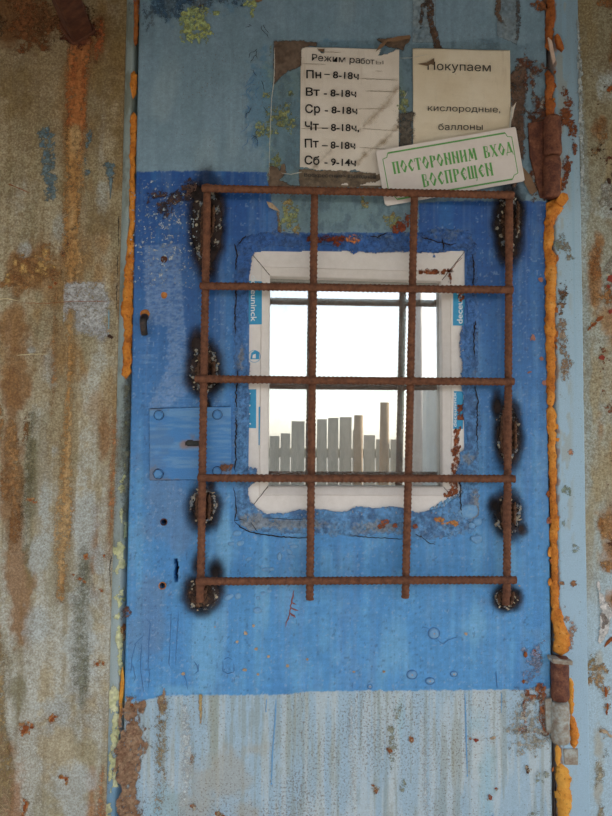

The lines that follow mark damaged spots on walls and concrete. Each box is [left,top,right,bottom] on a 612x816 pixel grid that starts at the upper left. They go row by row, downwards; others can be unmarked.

peeling [129,0,262,44]
rust [0,0,105,297]
rust [559,87,578,191]
rust [586,241,612,331]
rust [0,404,37,553]
rust [54,307,86,603]
rust [443,404,464,498]
crack [473,387,481,449]
rust [596,514,612,573]
rust [18,720,34,737]
rust [95,690,170,816]
rust [500,640,550,758]